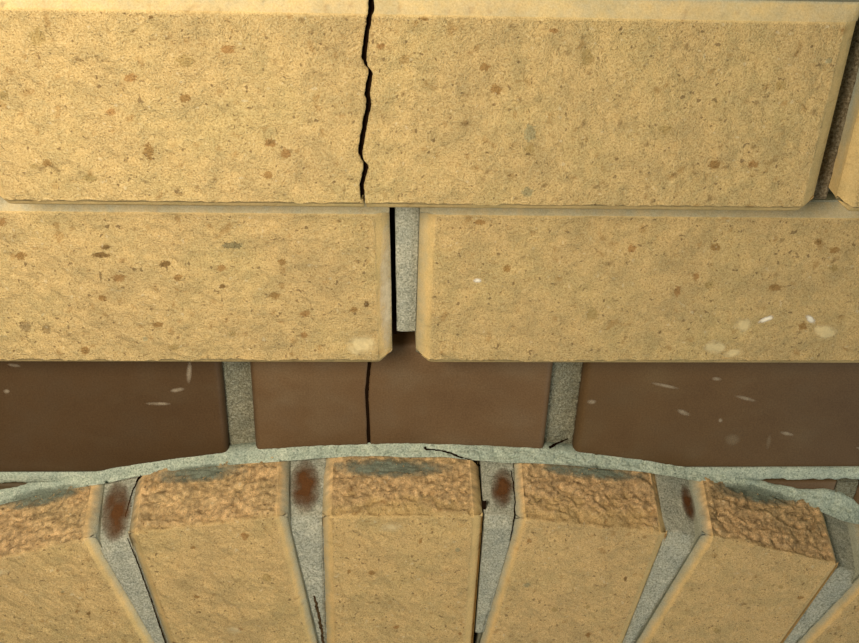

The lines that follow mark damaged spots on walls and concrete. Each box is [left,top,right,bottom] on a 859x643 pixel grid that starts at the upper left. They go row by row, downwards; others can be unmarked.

crack [358,0,374,202]
crack [364,362,372,443]
corrosion [293,467,317,506]
corrosion [493,475,512,503]
corrosion [682,489,693,517]
crack [424,447,486,643]